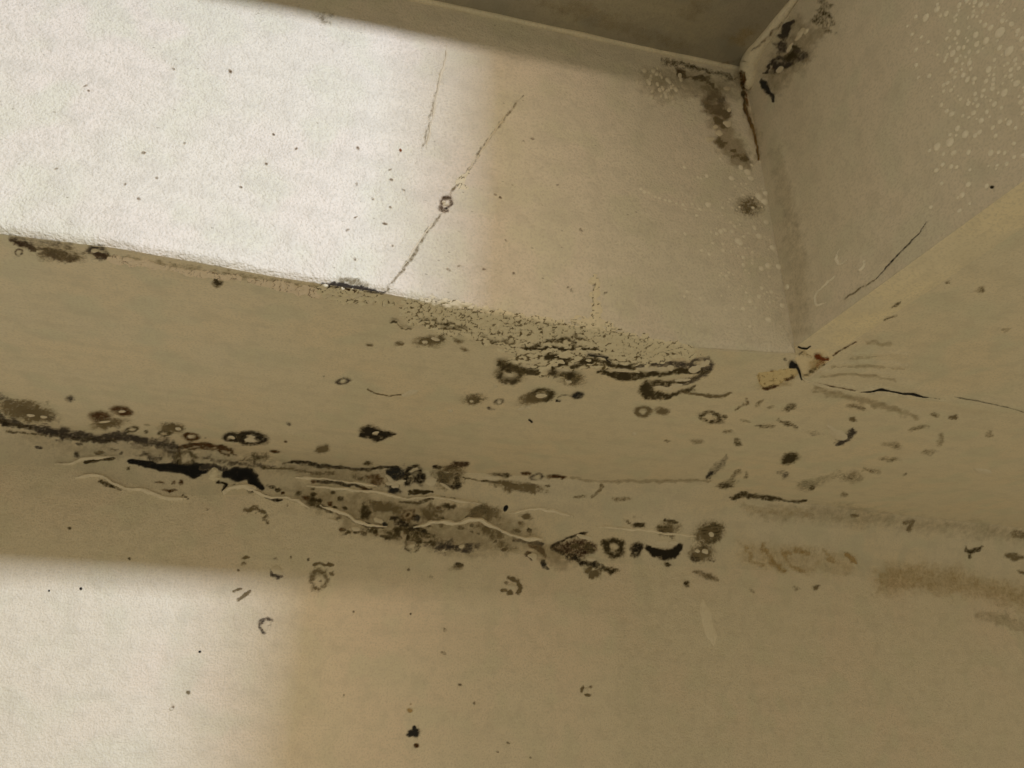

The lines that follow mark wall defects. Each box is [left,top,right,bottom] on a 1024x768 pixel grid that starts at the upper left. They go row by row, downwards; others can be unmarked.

water stain [760,0,835,102]
water stain [664,60,749,161]
crack [846,223,926,298]
mould [495,354,731,418]
spalling [757,346,832,391]
crack [802,377,1022,412]
peeling [54,455,187,501]
peeling [250,488,387,529]
water stain [0,397,724,591]
peeling [295,476,482,505]
mould [706,463,815,503]
mould [782,453,798,478]